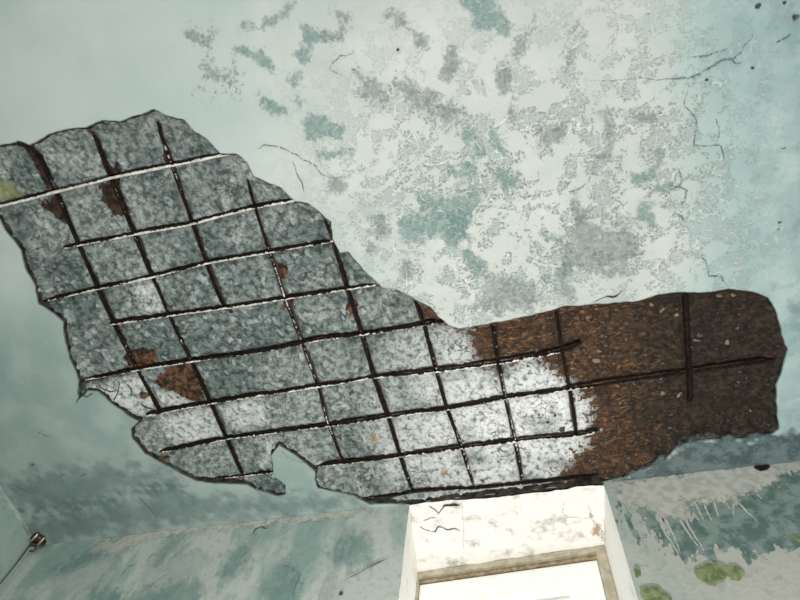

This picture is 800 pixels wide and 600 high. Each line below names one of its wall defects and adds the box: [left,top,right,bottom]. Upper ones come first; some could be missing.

crack [594,30,754,165]
rust [12,142,69,224]
rust [99,156,130,217]
crack [257,144,332,192]
crack [669,169,688,222]
spalling [0,109,788,505]
rust [123,347,158,367]
rust [154,364,206,403]
crack [419,504,464,552]
leakage [612,431,800,565]